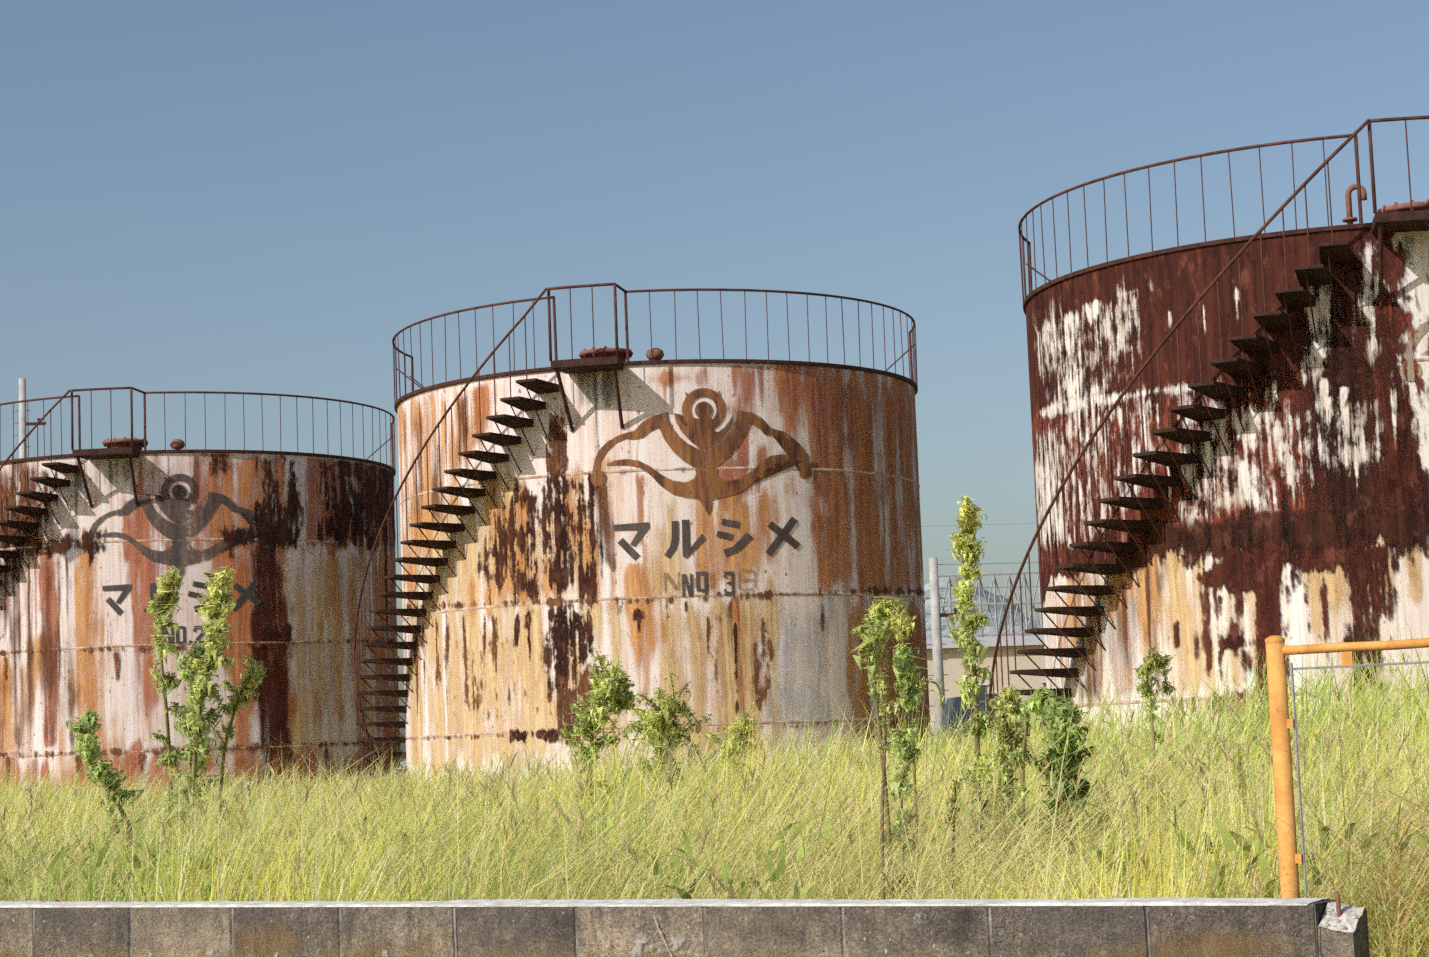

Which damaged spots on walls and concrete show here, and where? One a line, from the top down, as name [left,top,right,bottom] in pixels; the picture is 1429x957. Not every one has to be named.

rust [0,385,827,805]
rust [660,370,675,394]
rust [732,364,931,760]
peeling [1034,286,1397,549]
rust [1026,228,1429,716]
peeling [1358,244,1377,362]
damp [632,934,684,956]